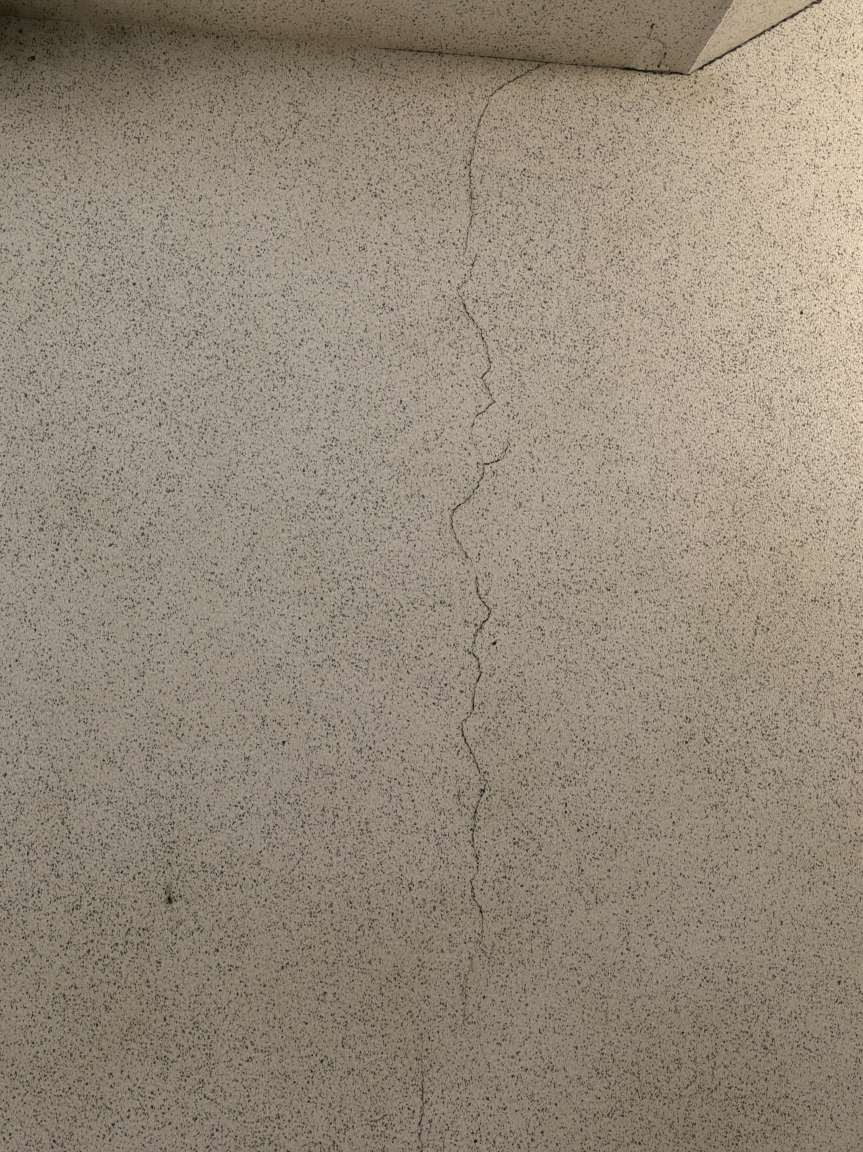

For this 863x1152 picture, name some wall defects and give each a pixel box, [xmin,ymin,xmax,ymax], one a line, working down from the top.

crack [380,0,823,1025]
crack [417,1037,425,1152]